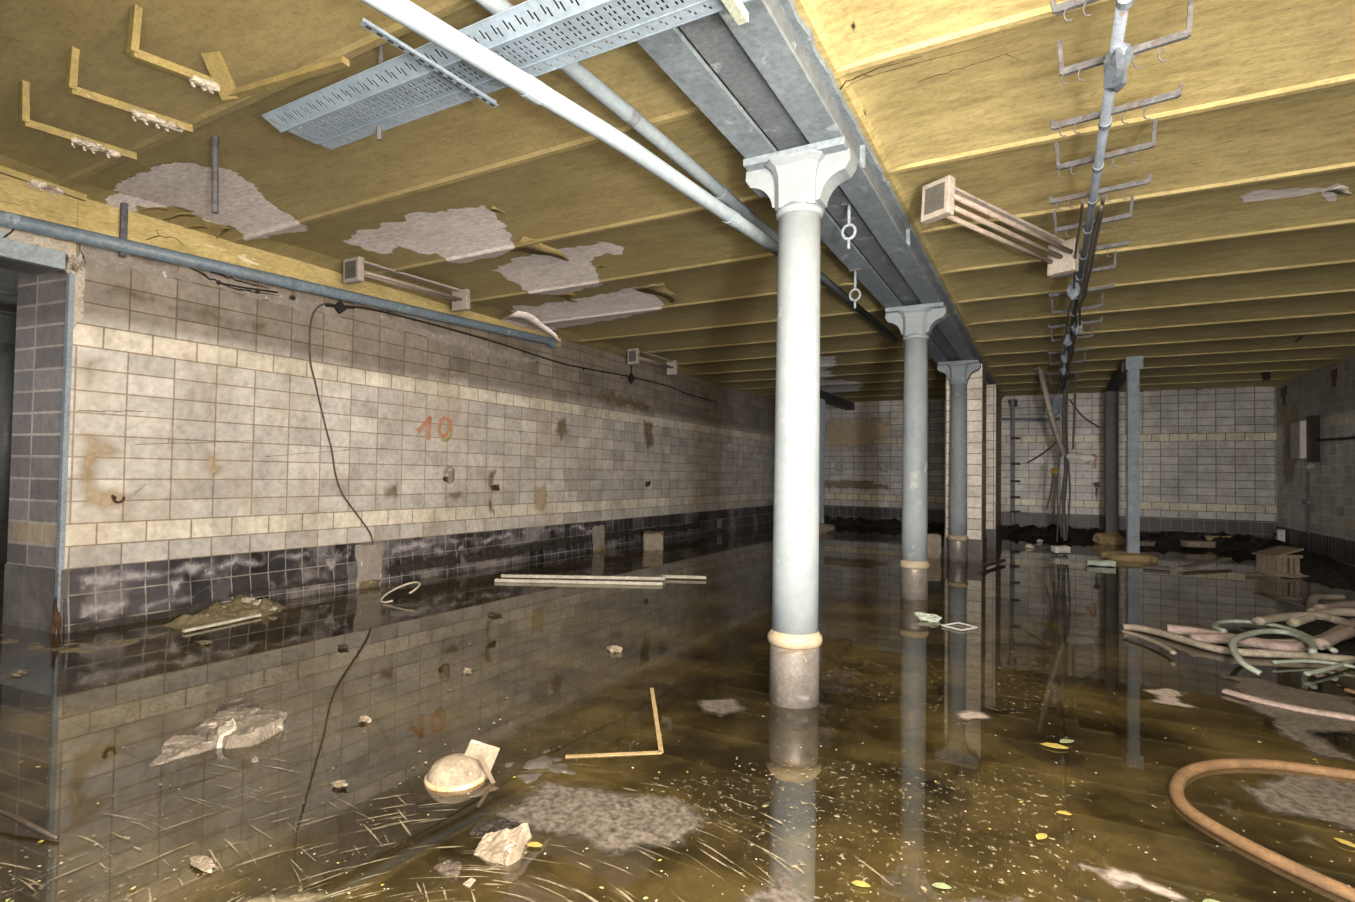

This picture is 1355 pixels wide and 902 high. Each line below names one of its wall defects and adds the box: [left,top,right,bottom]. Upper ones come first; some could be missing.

peeling [105,162,309,241]
peeling [1240,183,1353,203]
peeling [343,205,676,342]